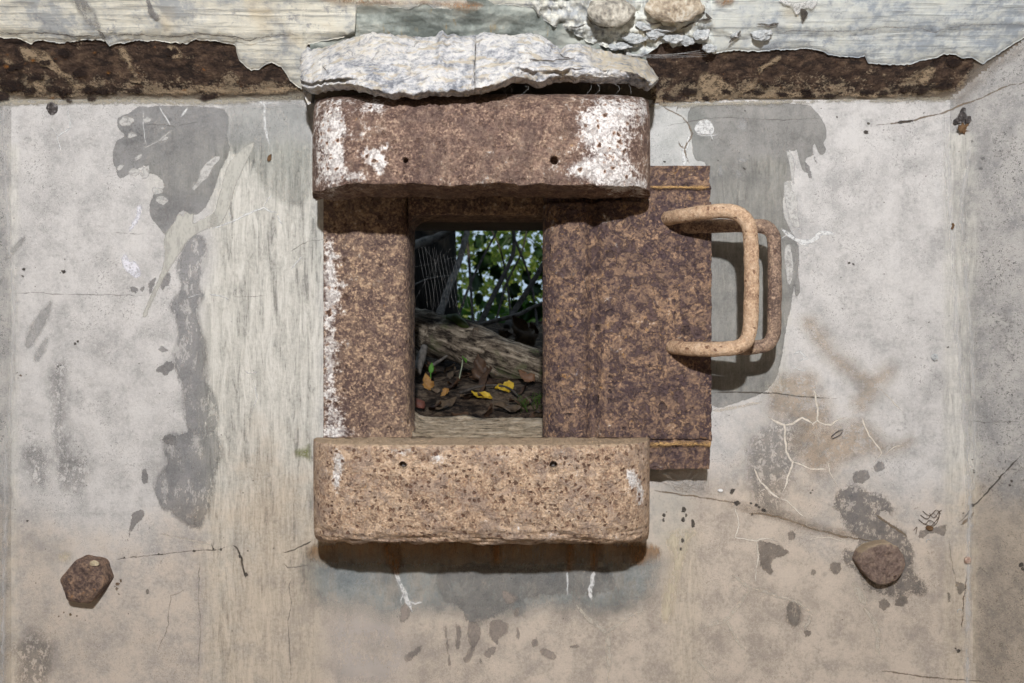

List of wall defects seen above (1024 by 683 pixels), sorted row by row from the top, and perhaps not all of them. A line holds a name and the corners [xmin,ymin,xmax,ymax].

spalling [0,0,1022,108]
crack [864,83,1021,134]
leakage [113,103,310,234]
leakage [688,103,835,407]
leakage [130,235,221,528]
leakage [129,510,144,535]
crack [121,540,248,579]
leakage [312,560,655,665]
crack [659,391,907,581]
leakage [830,462,946,654]
crack [959,460,1017,525]